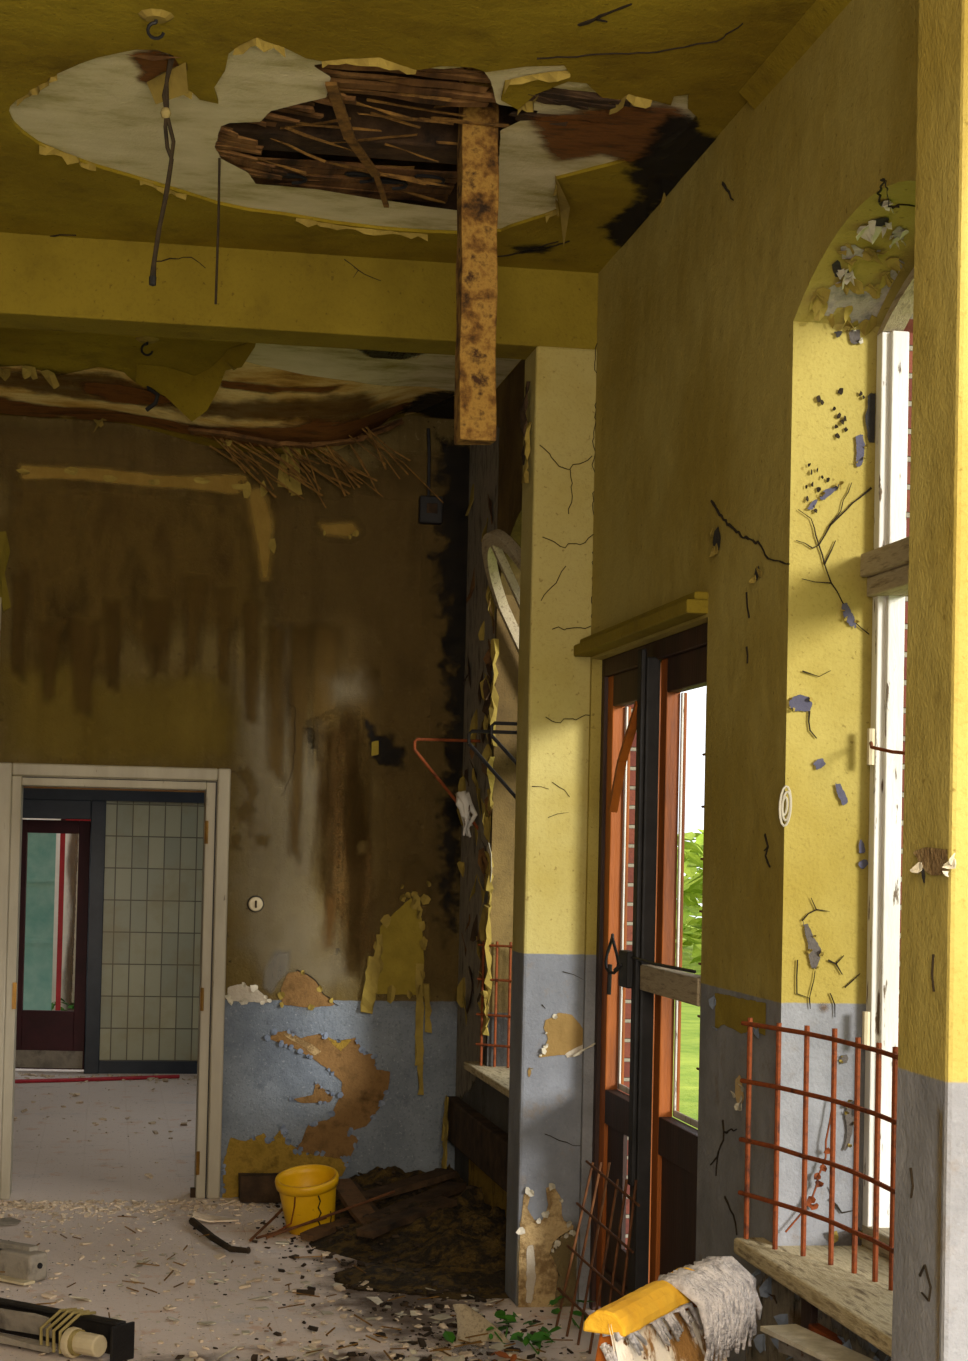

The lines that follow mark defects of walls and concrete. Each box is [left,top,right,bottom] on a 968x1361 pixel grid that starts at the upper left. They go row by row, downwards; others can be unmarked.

peeling [9,37,457,241]
peeling [485,66,695,246]
peeling [809,201,909,344]
peeling [0,343,455,446]
spalling [17,446,302,579]
crack [710,483,872,634]
damp [0,426,470,998]
peeling [441,426,500,1169]
spalling [778,785,792,827]
peeling [360,863,432,1095]
peeling [221,1028,390,1198]
spalling [468,1159,576,1324]